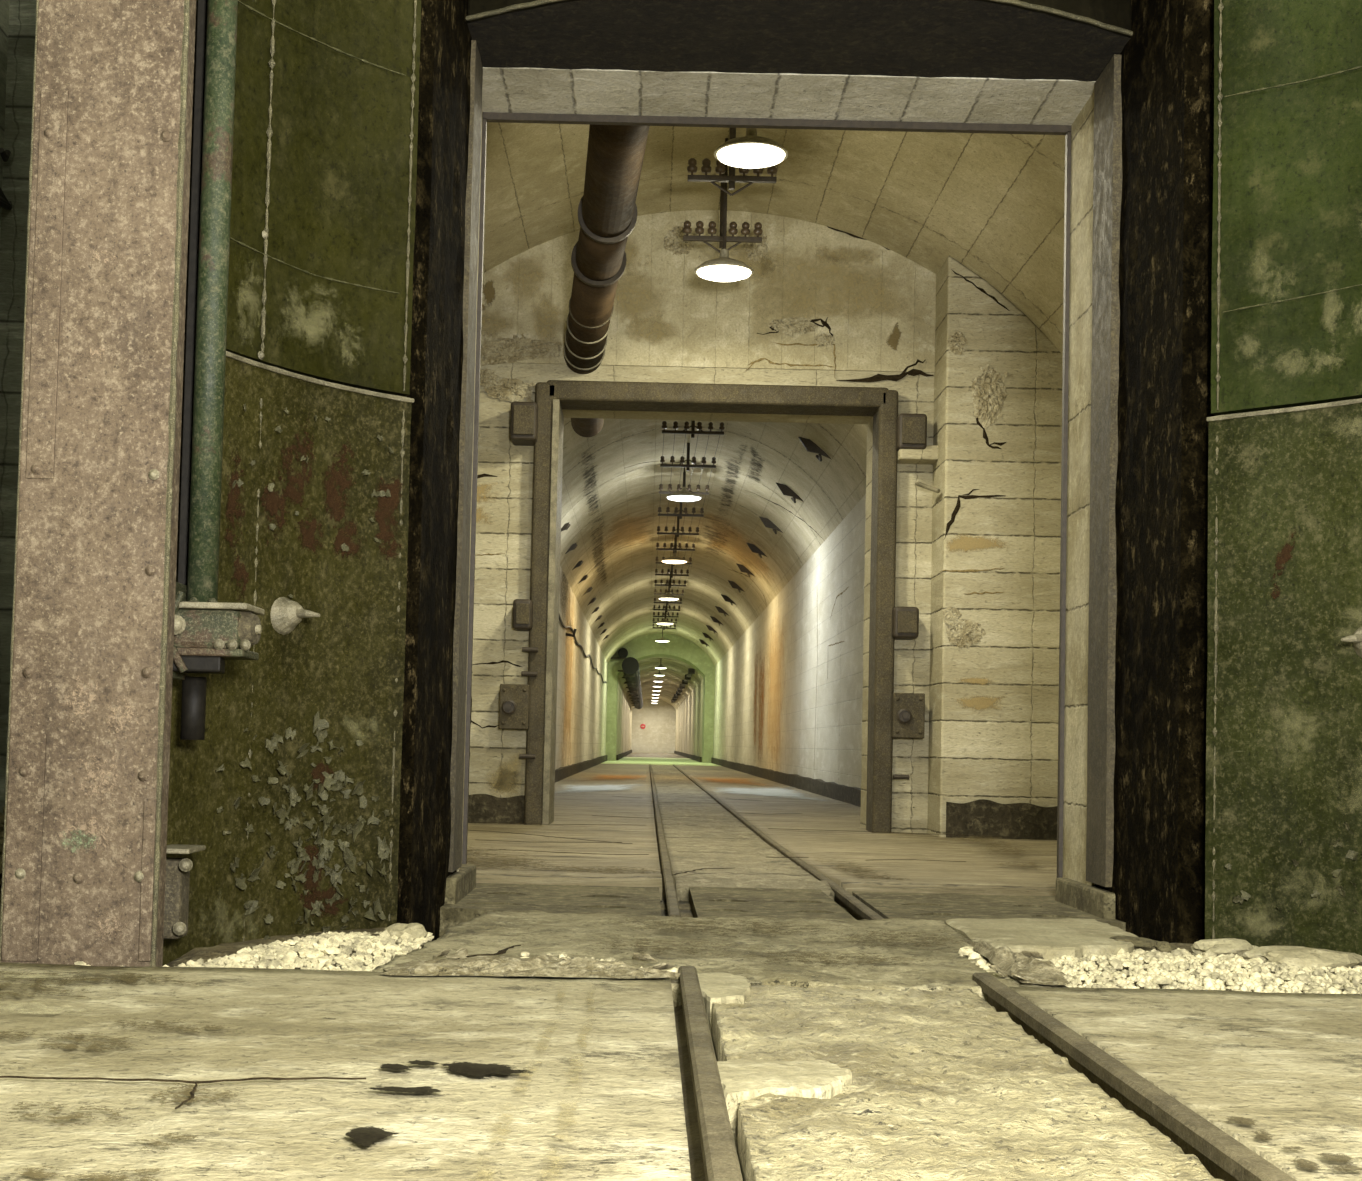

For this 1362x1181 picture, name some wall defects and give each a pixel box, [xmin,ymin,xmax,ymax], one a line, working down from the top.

crack [747,317,934,382]
corrosion [259,418,403,561]
crack [942,489,1005,595]
crack [471,660,522,728]
peeling [216,711,391,940]